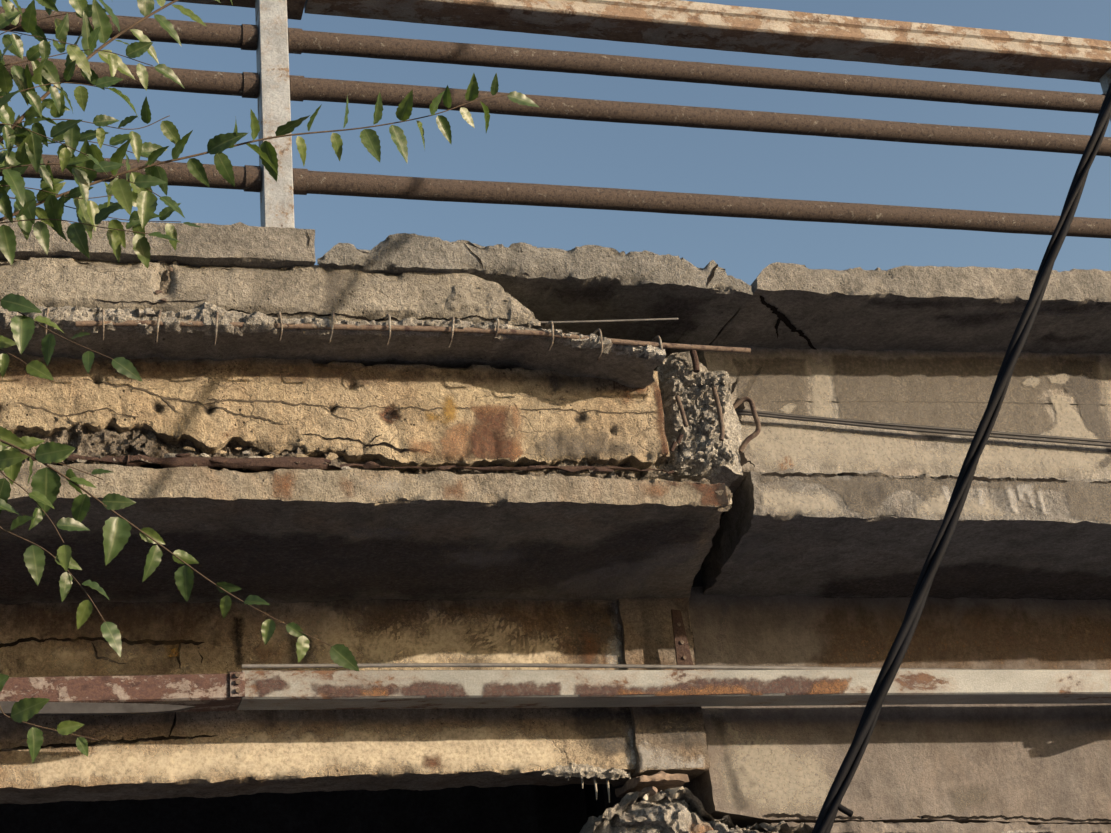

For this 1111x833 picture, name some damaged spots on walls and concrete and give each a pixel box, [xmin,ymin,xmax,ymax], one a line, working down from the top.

spalling [0,267,761,512]
crack [15,378,474,453]
water stain [833,356,1111,467]
corrosion [66,385,725,507]
water stain [804,472,957,516]
water stain [963,480,1111,523]
crack [0,637,205,668]
corrosion [312,681,469,698]
corrosion [482,681,561,697]
corrosion [575,676,852,697]
crack [0,712,218,752]
spalling [612,798,778,833]